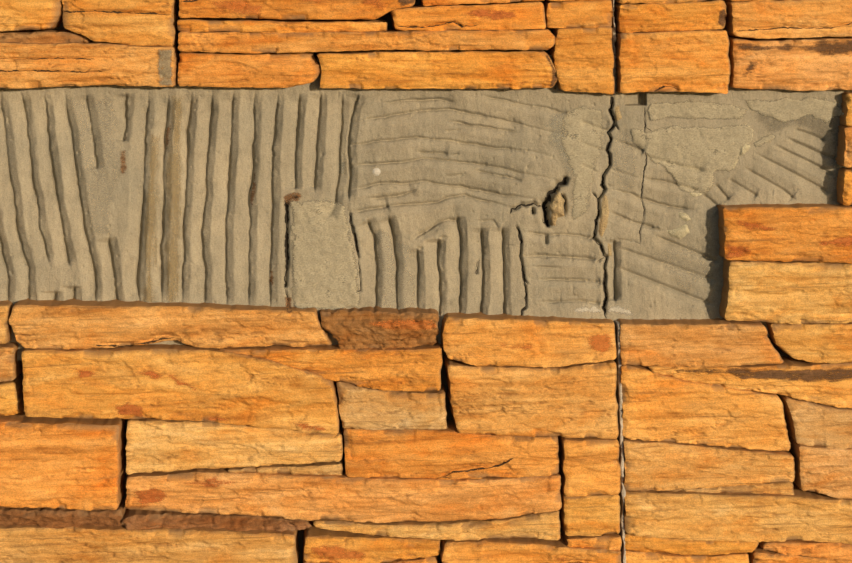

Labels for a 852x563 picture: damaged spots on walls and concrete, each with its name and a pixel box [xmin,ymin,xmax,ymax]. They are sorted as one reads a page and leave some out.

peeling [648,101,746,121]
spalling [549,189,565,226]
crack [592,96,618,317]
spalling [598,194,612,256]
crack [636,152,647,244]